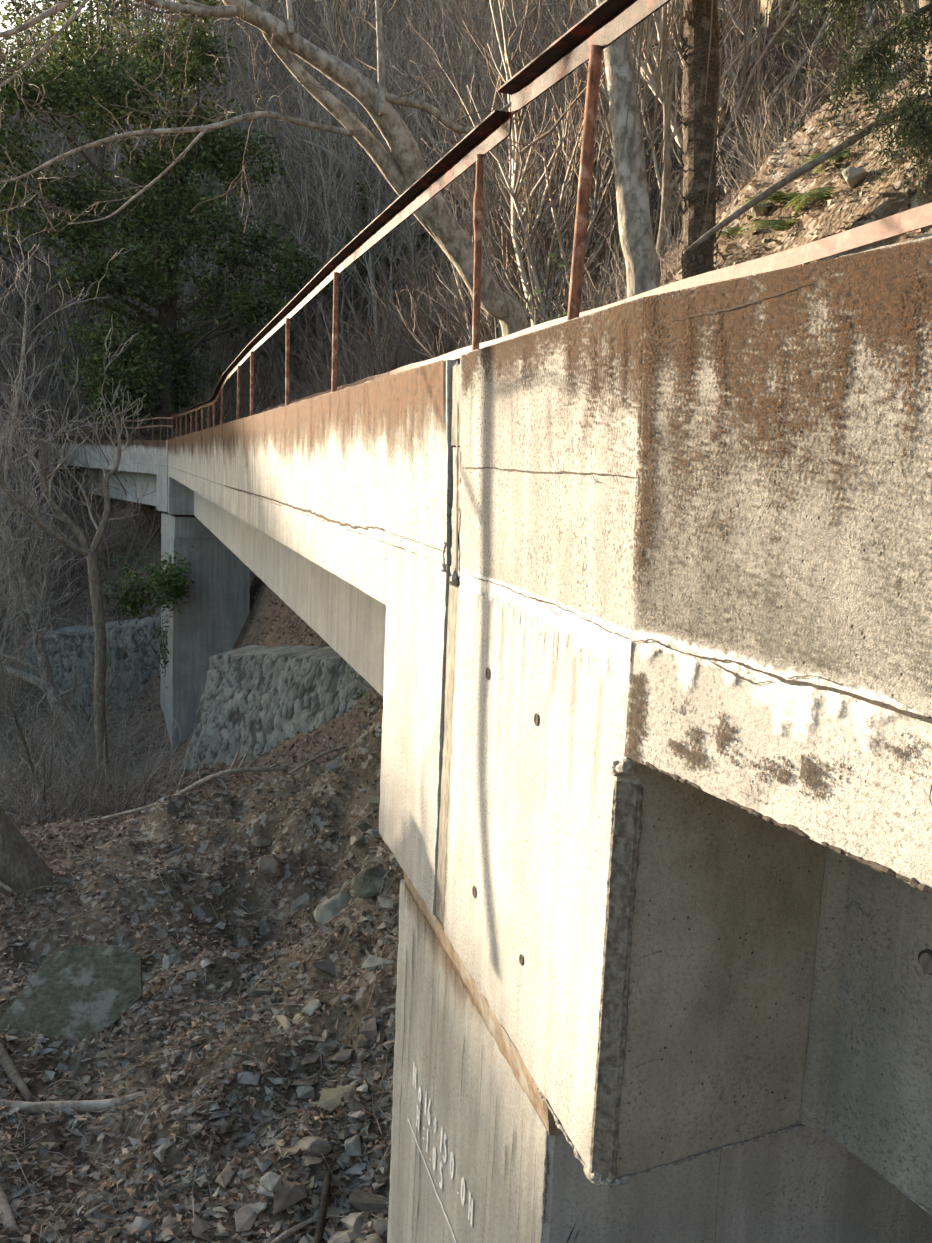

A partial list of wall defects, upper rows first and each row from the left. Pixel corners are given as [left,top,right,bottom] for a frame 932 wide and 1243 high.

crack [466,467,637,483]
crack [224,485,932,917]
leakage [460,298,932,764]